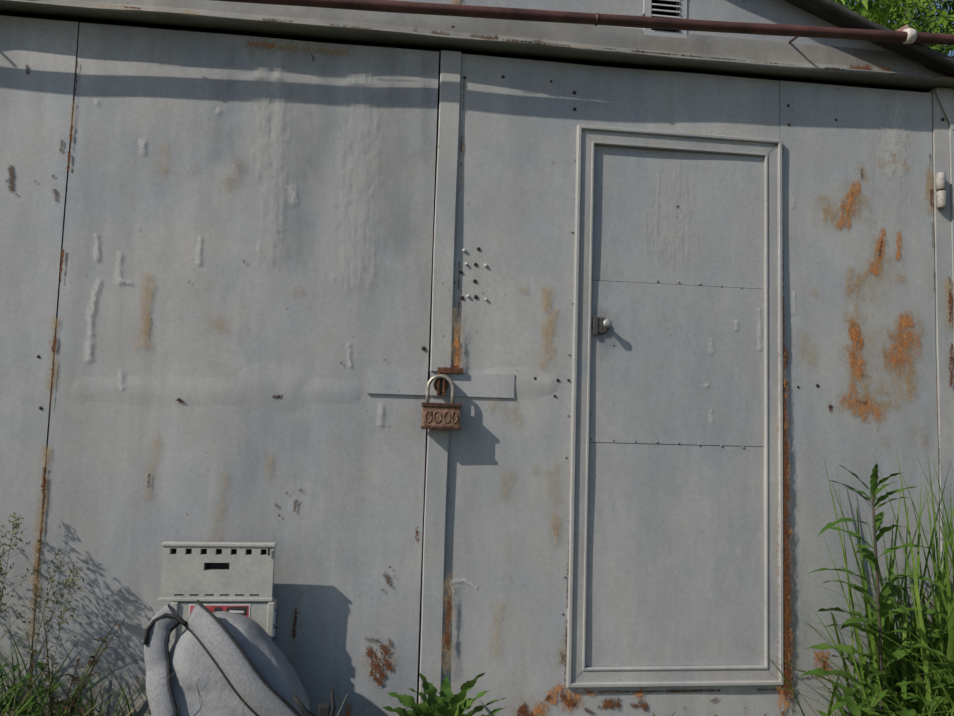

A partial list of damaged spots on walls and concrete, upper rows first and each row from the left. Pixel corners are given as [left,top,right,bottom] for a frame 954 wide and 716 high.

rust [826,167,865,229]
rust [446,262,461,368]
rust [829,318,884,421]
rust [848,228,902,292]
rust [886,312,920,395]
rust [934,270,953,322]
rust [758,263,794,716]
rust [30,447,50,637]
rust [364,637,393,686]
rust [517,621,720,716]